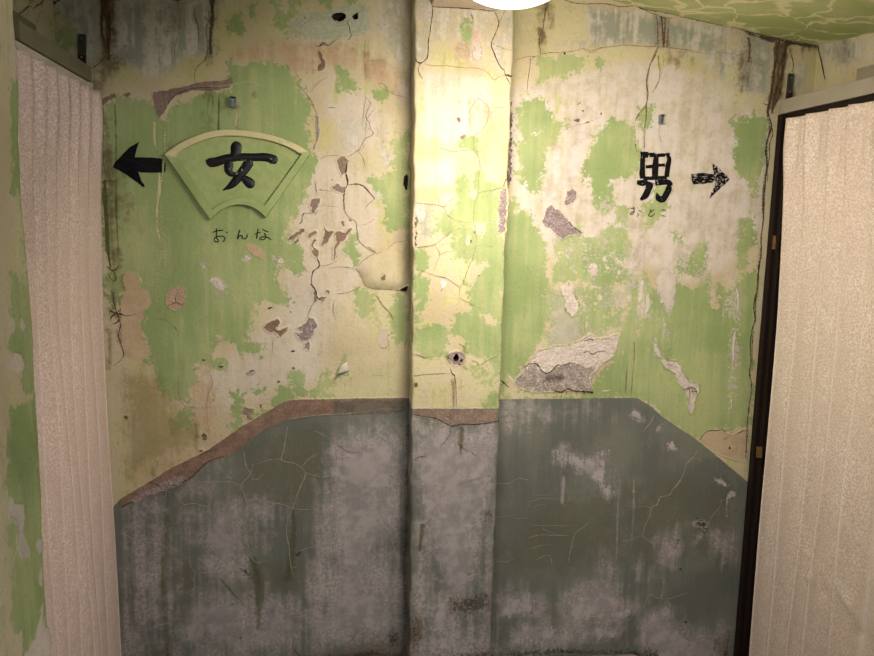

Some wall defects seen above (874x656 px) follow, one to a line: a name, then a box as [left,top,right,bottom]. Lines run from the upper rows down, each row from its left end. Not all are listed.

crack [168,0,263,104]
leakage [103,180,119,267]
peeling [286,218,354,261]
crack [300,17,406,348]
flaking render [412,213,420,249]
crack [415,0,825,552]
peeling [261,307,319,352]
leakage [333,400,404,414]
flaking render [512,332,620,395]
crack [122,354,588,626]
leakage [408,424,495,641]
leakage [500,580,717,656]